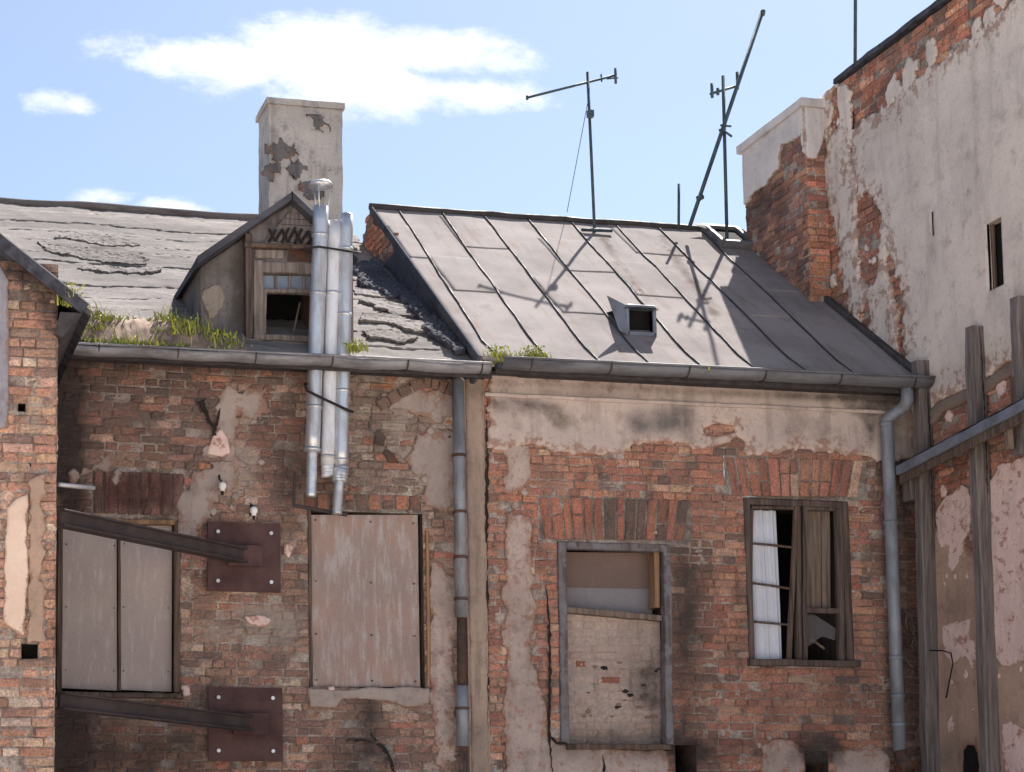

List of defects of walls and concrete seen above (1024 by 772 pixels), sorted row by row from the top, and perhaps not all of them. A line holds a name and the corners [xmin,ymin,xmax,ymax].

spalling [261,137,324,200]
spalling [306,114,331,132]
spalling [745,0,1013,327]
spalling [857,193,906,358]
peeling [173,382,272,537]
spalling [704,424,745,456]
spalling [933,391,968,445]
peeling [933,450,972,586]
spalling [987,361,1012,416]
peeling [989,427,1024,679]